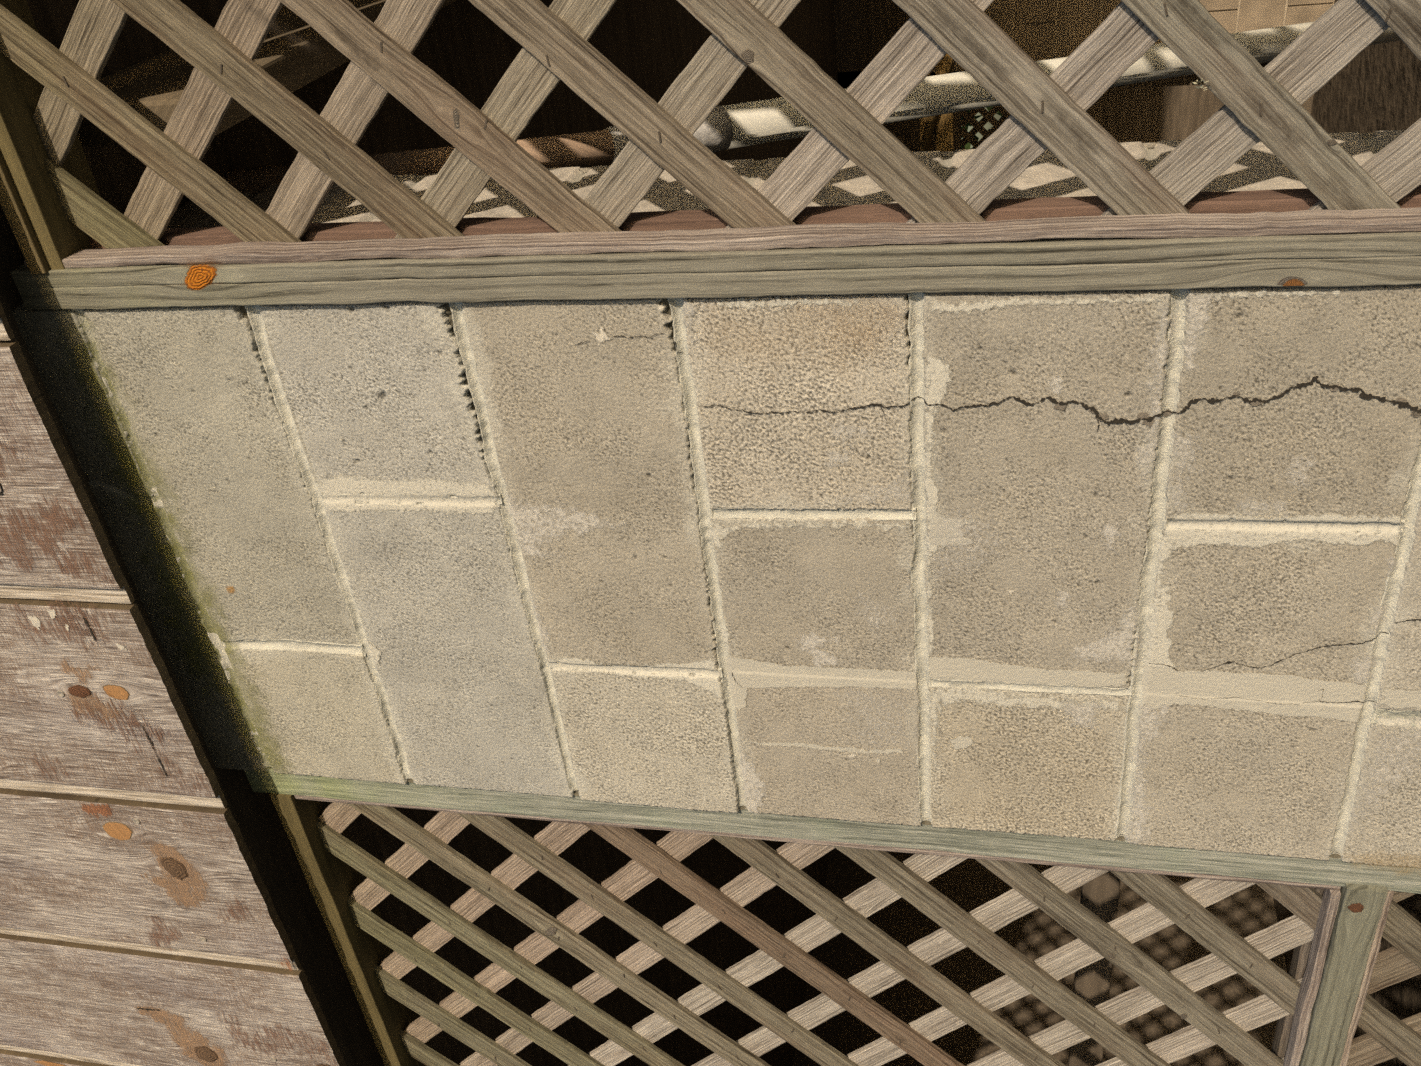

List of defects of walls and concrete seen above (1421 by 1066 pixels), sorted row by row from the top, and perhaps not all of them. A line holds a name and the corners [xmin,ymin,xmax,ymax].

crack [703,376,1421,431]
crack [1149,619,1421,704]